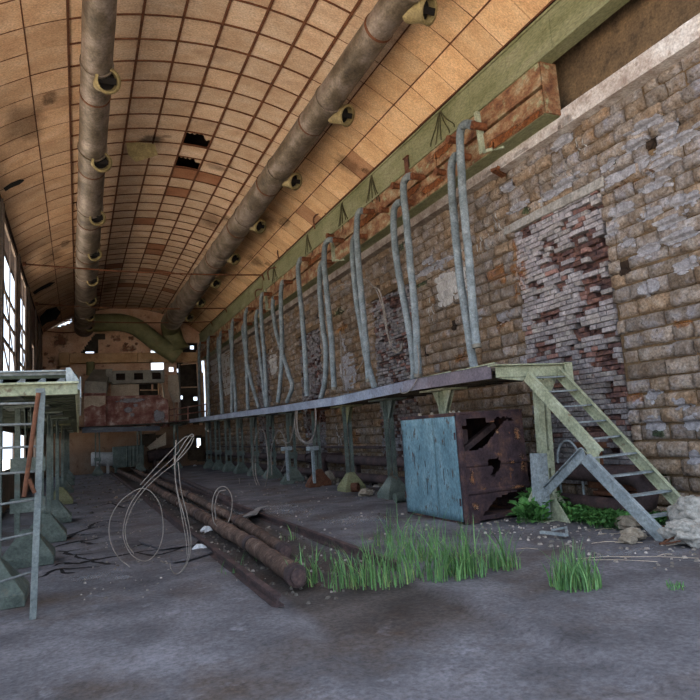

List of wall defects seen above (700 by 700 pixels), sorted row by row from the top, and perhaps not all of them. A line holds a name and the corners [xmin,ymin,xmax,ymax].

corrosion [485,109,542,150]
corrosion [407,177,444,198]
spalling [519,220,542,239]
spalling [540,114,700,318]
spalling [373,290,411,383]
spalling [530,309,560,326]
spalling [534,335,556,358]
spalling [564,327,629,404]
spalling [383,398,434,457]
spalling [585,426,620,453]
crack [38,500,185,578]